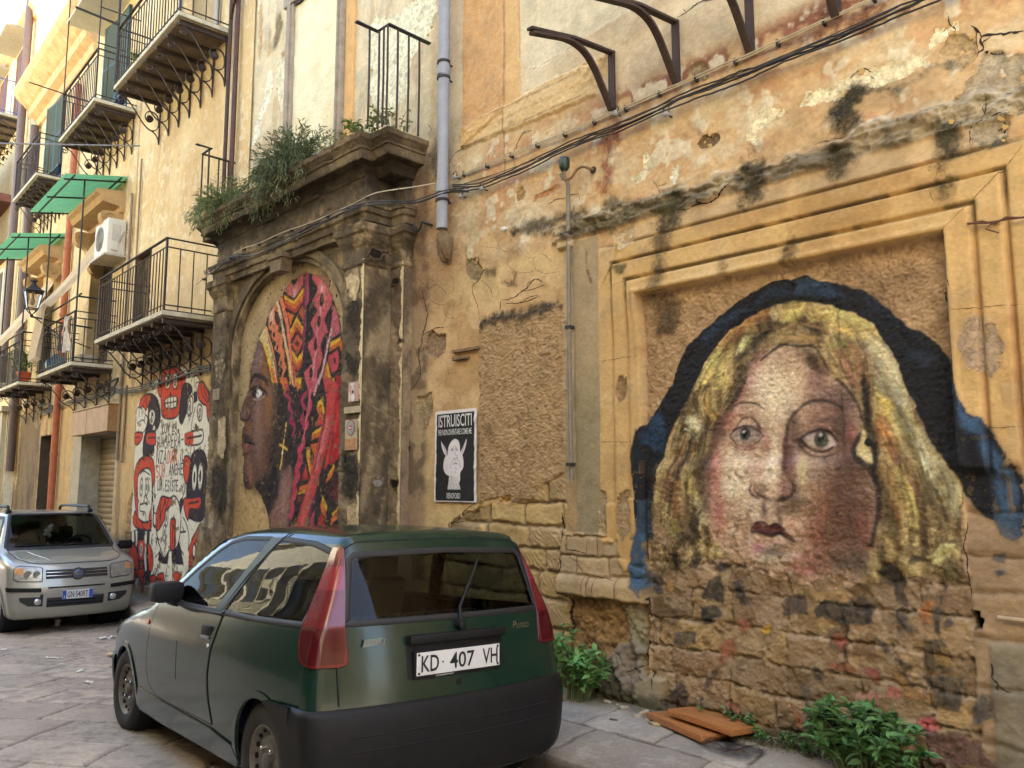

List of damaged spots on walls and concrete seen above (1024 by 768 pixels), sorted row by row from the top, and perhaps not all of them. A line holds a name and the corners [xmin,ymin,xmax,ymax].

spalling [746,21,1024,147]
spalling [697,133,720,149]
spalling [631,152,654,184]
spalling [670,165,679,185]
spalling [466,257,484,282]
crack [411,242,549,390]
spalling [424,330,446,360]
spalling [448,507,483,530]
spalling [598,489,630,542]